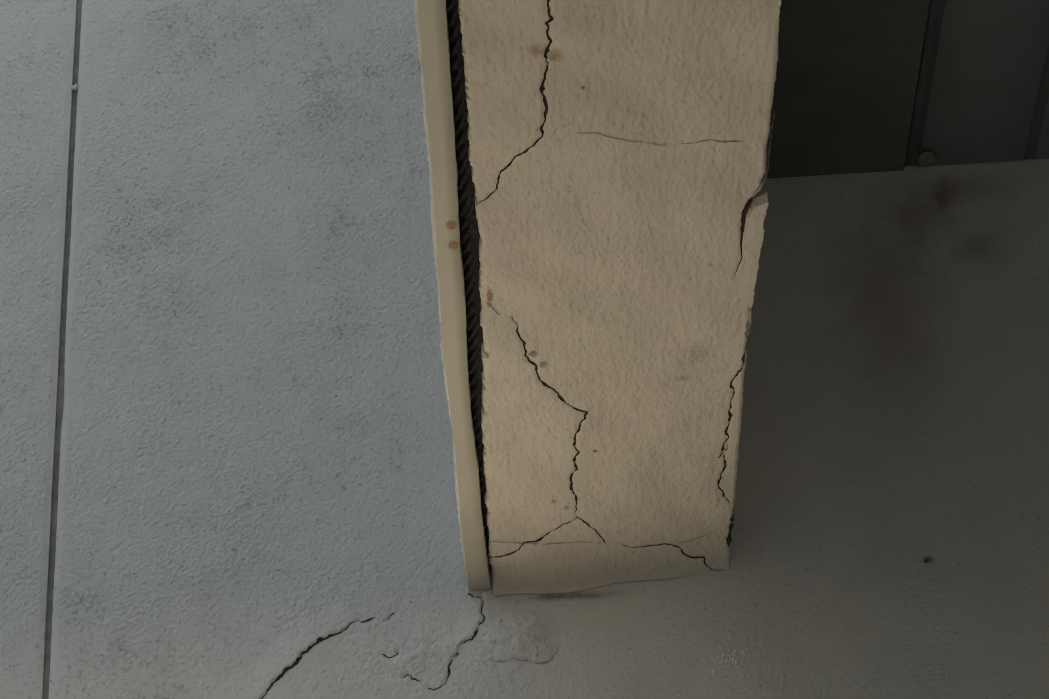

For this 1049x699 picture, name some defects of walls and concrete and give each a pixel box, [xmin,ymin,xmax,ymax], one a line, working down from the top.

crack [476,0,554,205]
crack [576,133,741,146]
crack [485,301,719,571]
crack [717,336,749,503]
crack [261,613,395,699]
crack [382,593,561,690]